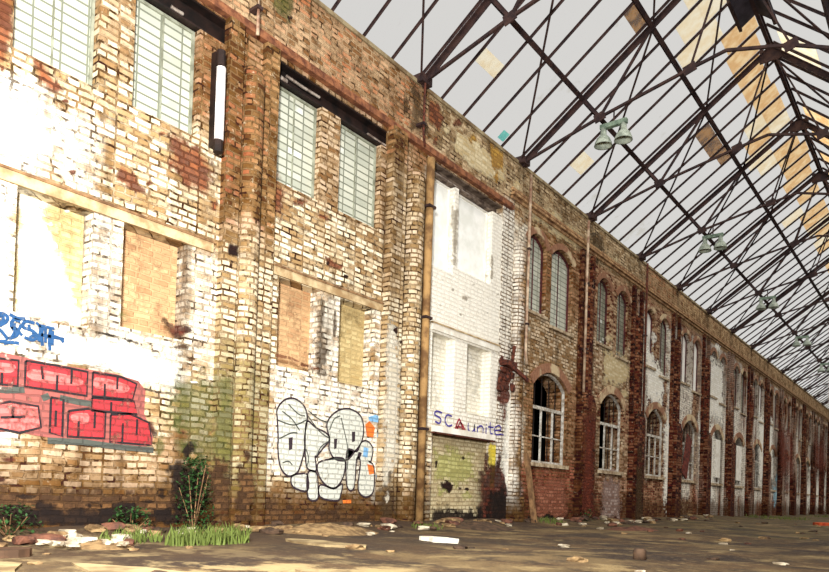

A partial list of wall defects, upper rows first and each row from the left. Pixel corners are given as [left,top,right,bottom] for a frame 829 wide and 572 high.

spalling [0,0,13,71]
spalling [33,60,68,103]
spalling [109,167,152,193]
peeling [15,194,180,387]
spalling [161,318,192,361]
peeling [645,332,670,501]